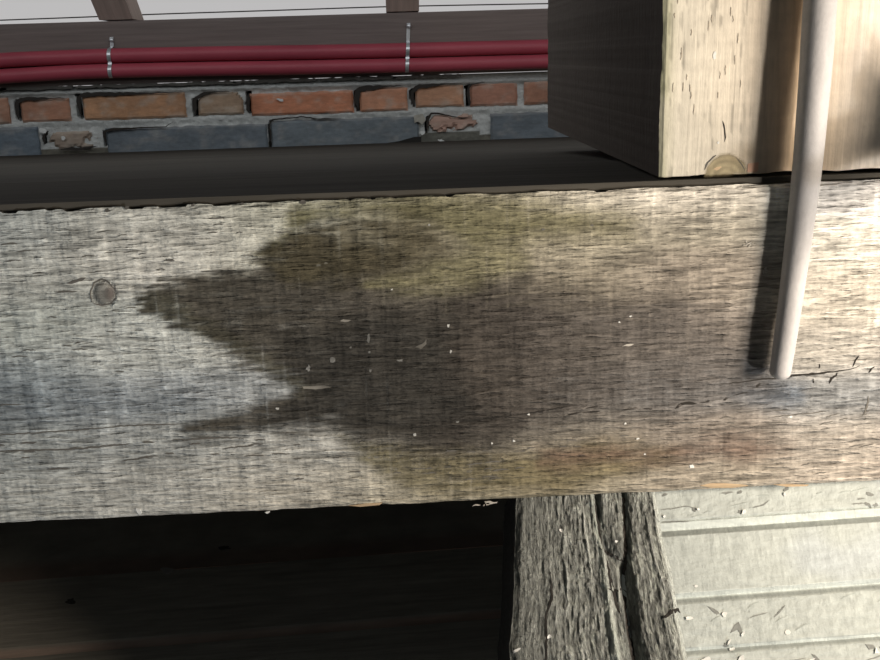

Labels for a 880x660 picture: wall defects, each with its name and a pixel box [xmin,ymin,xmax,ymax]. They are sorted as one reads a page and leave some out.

damp [136,221,758,450]
crack [595,498,635,660]
peeling [723,622,745,660]